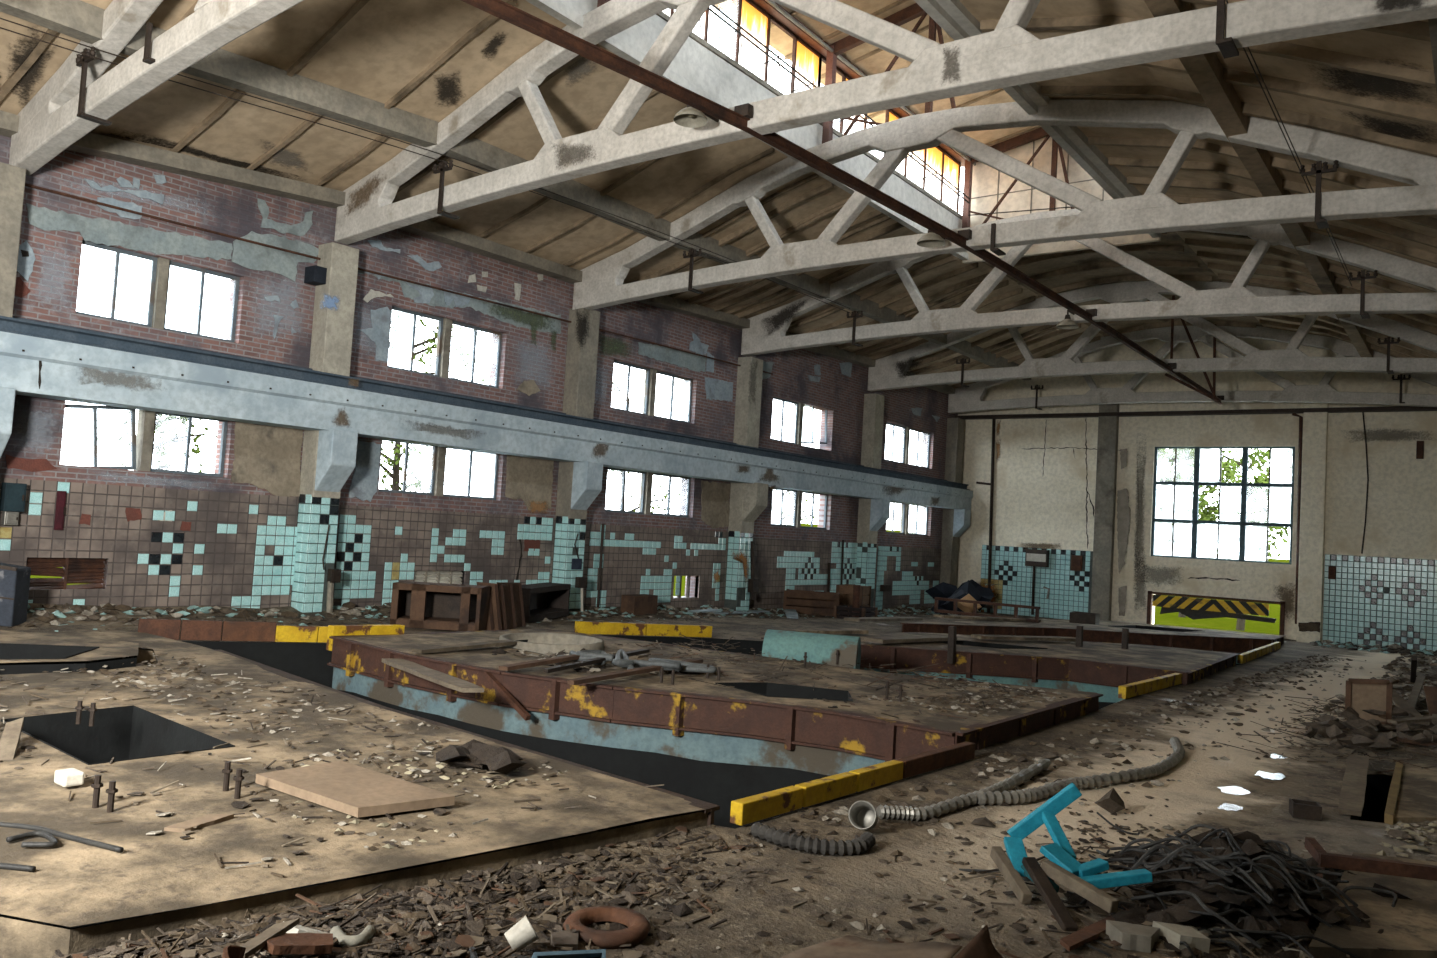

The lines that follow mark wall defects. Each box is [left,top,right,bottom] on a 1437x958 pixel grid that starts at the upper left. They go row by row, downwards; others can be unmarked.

damp [1377,0,1422,12]
damp [0,31,52,105]
damp [436,73,461,105]
peeling [15,174,319,298]
peeling [358,240,561,362]
peeling [583,480,730,608]